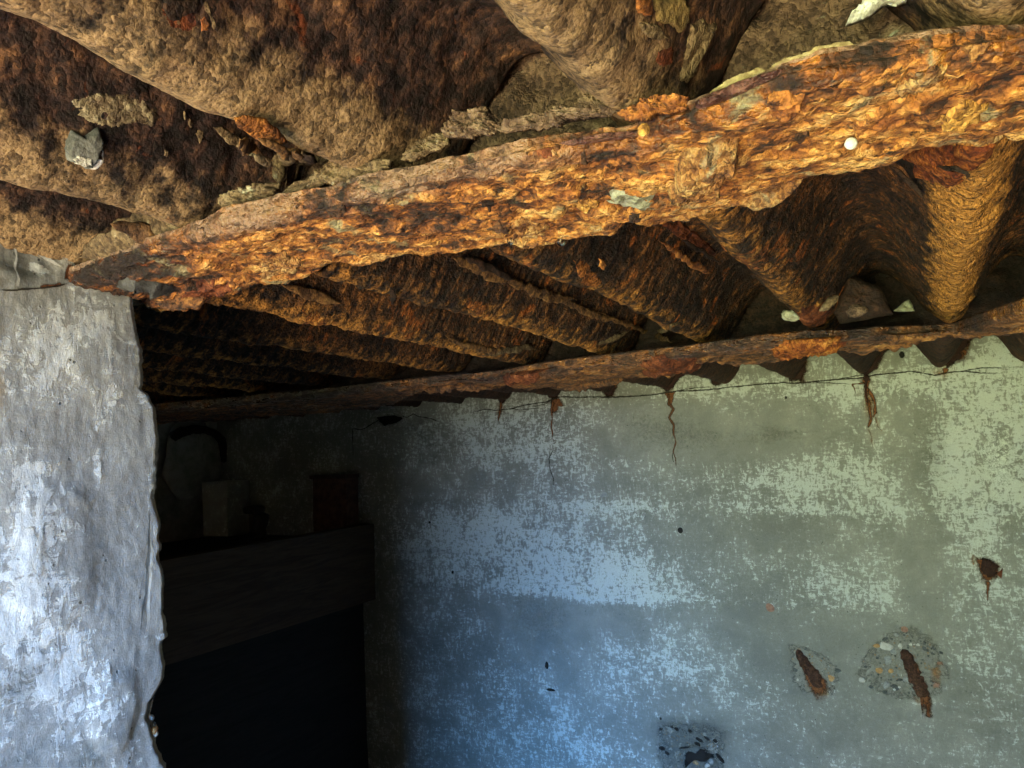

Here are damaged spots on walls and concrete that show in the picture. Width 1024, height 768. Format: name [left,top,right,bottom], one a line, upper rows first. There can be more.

corrosion [793,130,810,144]
corrosion [421,180,447,190]
corrosion [629,208,641,223]
corrosion [573,260,602,288]
corrosion [788,358,808,384]
corrosion [937,339,972,374]
corrosion [852,349,889,441]
corrosion [548,394,564,486]
corrosion [972,555,1003,601]
spalling [789,645,841,695]
spalling [857,626,949,718]
spalling [659,717,725,768]